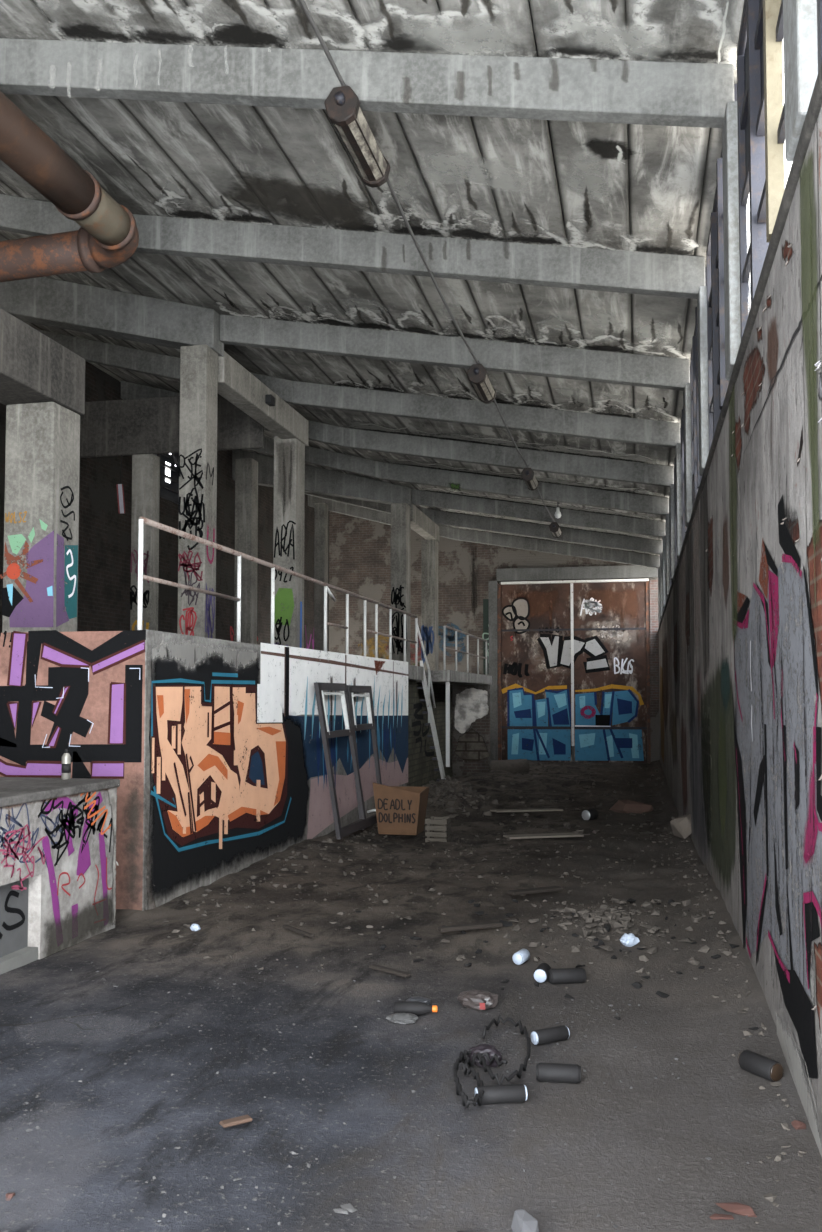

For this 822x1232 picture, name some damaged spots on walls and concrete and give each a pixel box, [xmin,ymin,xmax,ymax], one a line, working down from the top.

damp [129,157,699,255]
flaking render [781,518,822,711]
flaking render [811,942,822,1034]